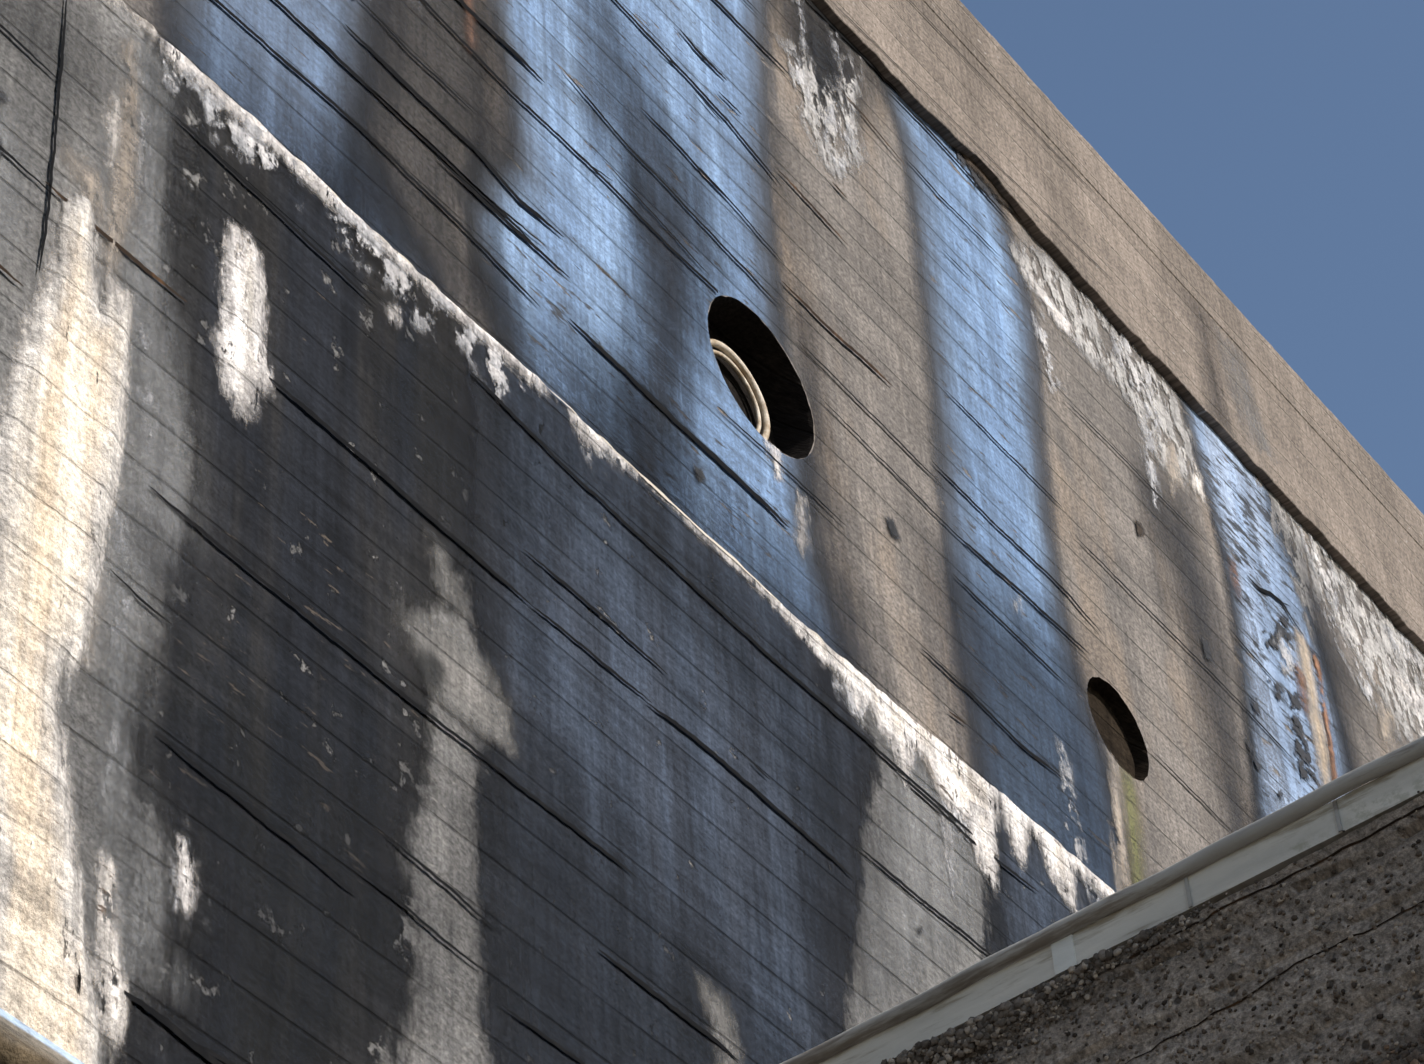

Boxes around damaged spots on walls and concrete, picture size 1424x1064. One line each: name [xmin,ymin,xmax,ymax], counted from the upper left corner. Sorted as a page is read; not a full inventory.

crack [0,0,68,287]
damp [0,44,154,1064]
crack [94,223,187,302]
spalling [419,653,444,691]
damp [107,0,1132,912]
peeling [778,0,865,179]
spalling [887,517,901,541]
peeling [1010,242,1204,505]
peeling [1258,478,1424,782]
damp [532,792,740,1064]
crack [1029,805,1424,1015]
crack [1125,900,1424,1064]